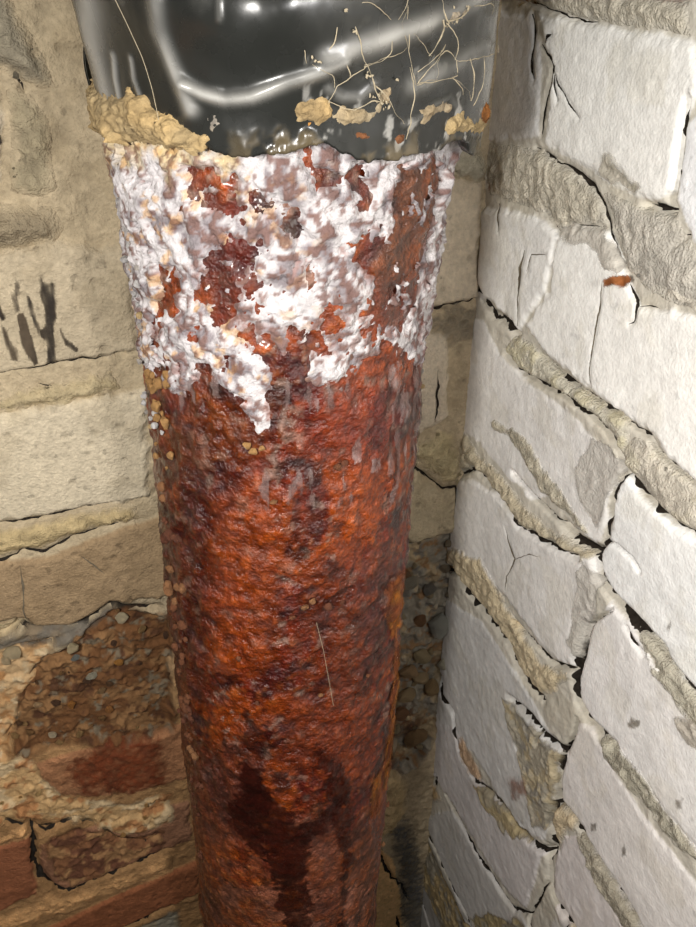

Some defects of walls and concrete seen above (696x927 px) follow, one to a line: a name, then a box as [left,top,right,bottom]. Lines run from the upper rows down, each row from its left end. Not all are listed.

damp [102,138,477,435]
crack [0,355,109,386]
rust [144,368,171,430]
rust [153,442,174,470]
rust [242,442,265,455]
rust [163,565,188,665]
rust [289,598,333,620]
rust [370,574,420,818]
damp [224,749,355,927]